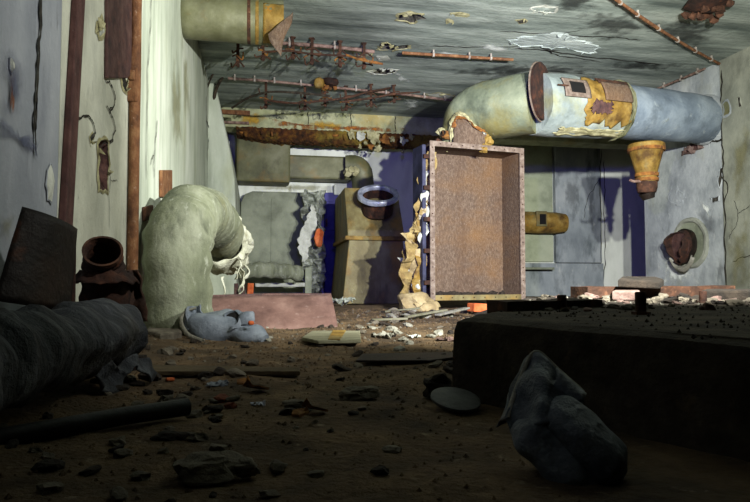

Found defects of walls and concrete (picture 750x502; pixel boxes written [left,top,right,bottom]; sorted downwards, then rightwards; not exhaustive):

spalling [394,10,426,24]
crack [33,0,43,155]
spalling [352,41,412,75]
crack [79,80,116,147]
corrosion [236,114,440,150]
peeling [348,129,414,153]
spalling [45,163,55,205]
spalling [89,131,114,195]
crack [707,122,750,285]